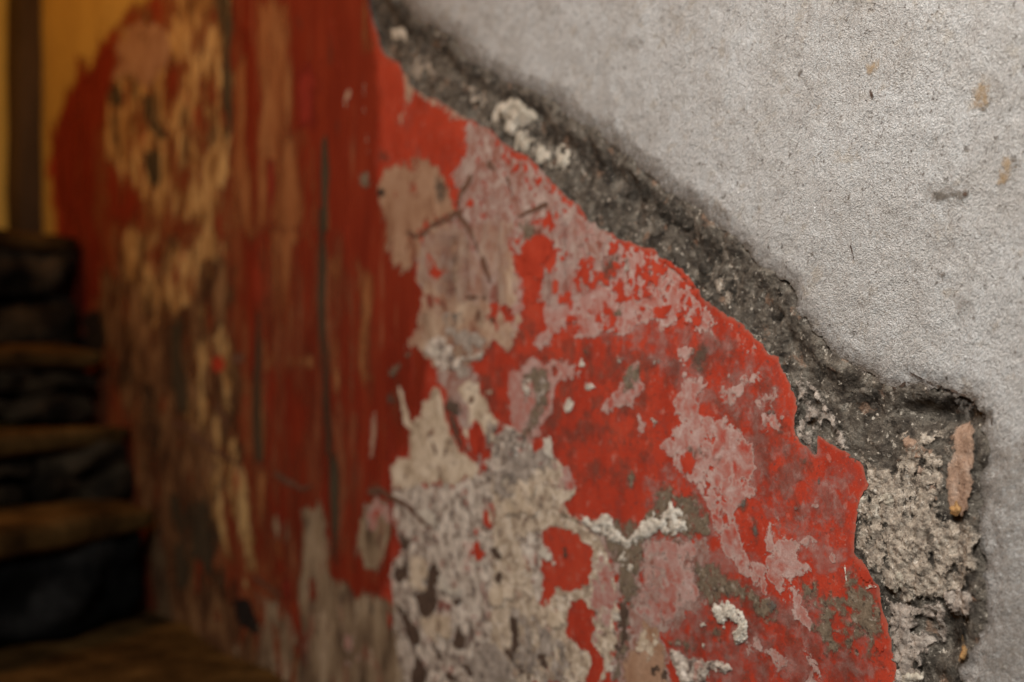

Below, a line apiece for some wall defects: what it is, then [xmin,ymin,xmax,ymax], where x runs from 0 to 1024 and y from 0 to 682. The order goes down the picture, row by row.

spalling [295,0,993,682]
leakage [669,600,748,682]